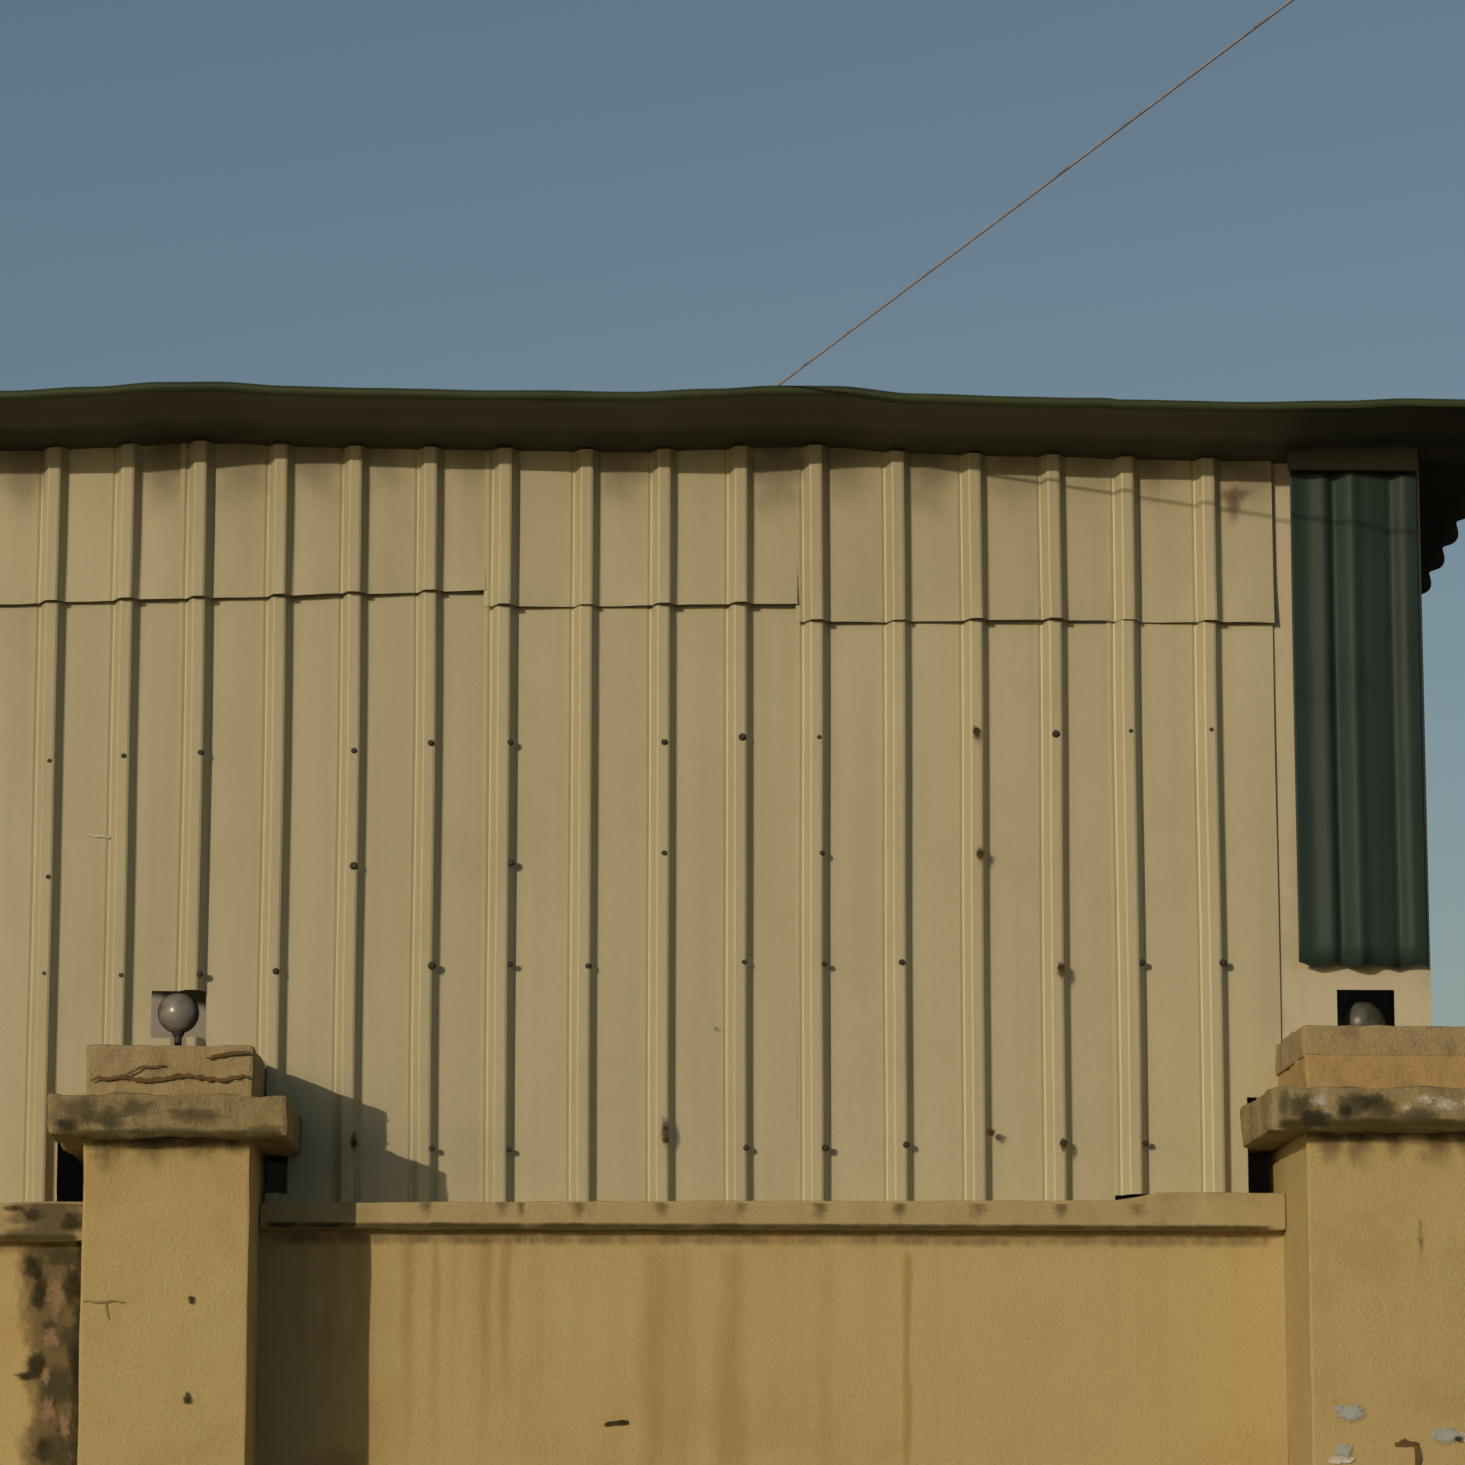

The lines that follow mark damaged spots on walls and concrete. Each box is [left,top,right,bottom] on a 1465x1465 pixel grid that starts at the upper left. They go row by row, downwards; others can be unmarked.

leakage [56,1102,278,1148]
leakage [1280,1094,1465,1143]
leakage [0,1203,82,1465]
peeling [1329,1445,1354,1464]
peeling [1333,1404,1364,1420]
peeling [1431,1427,1465,1442]